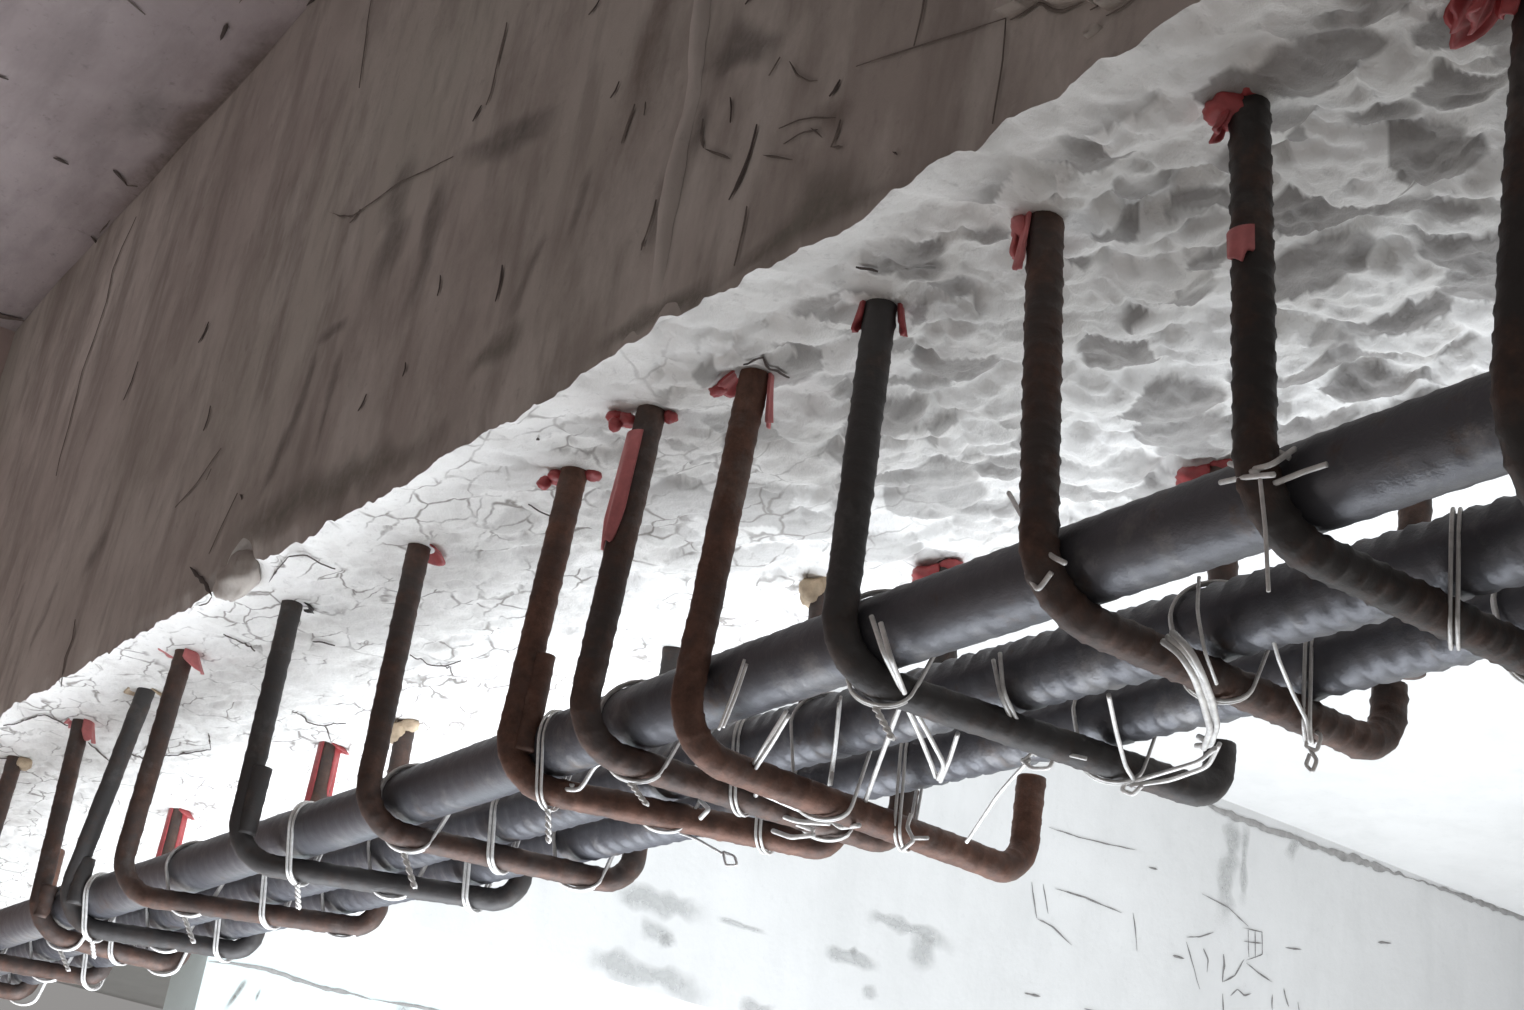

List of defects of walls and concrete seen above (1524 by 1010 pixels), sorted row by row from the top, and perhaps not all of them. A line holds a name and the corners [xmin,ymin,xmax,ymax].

crack [856,0,1133,124]
crack [330,156,453,223]
crack [700,56,843,266]
spalling [821,0,1524,846]
crack [175,448,255,651]
crack [269,554,335,582]
crack [0,619,211,761]
crack [292,711,346,741]
crack [410,654,461,676]
spalling [0,367,901,1001]
spalling [908,773,1046,883]